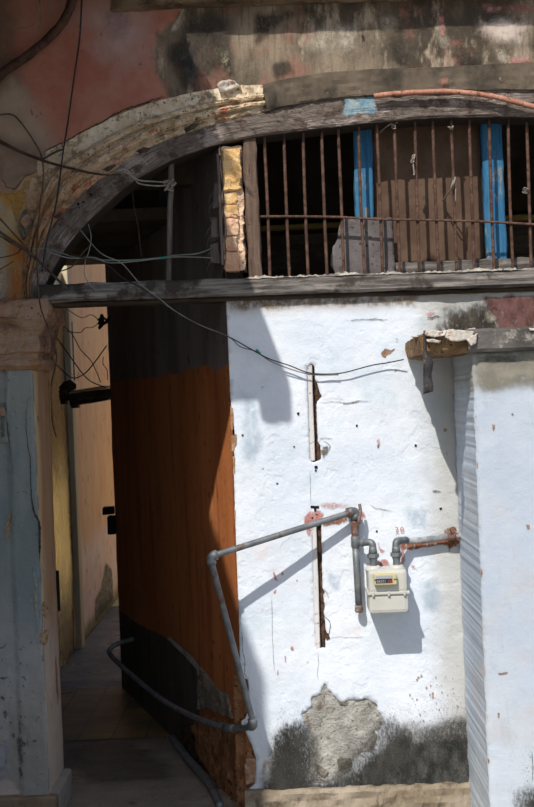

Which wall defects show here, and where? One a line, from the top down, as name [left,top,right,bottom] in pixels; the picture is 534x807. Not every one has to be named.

water stain [256,13,289,40]
water stain [312,26,354,51]
water stain [436,16,446,44]
water stain [483,5,526,42]
water stain [273,62,290,76]
flaking render [43,96,163,154]
peeling [424,328,478,346]
corrosion [400,528,460,552]
spalling [168,637,256,807]
spalling [301,683,382,784]
water stain [263,693,469,790]
mould [518,755,534,807]